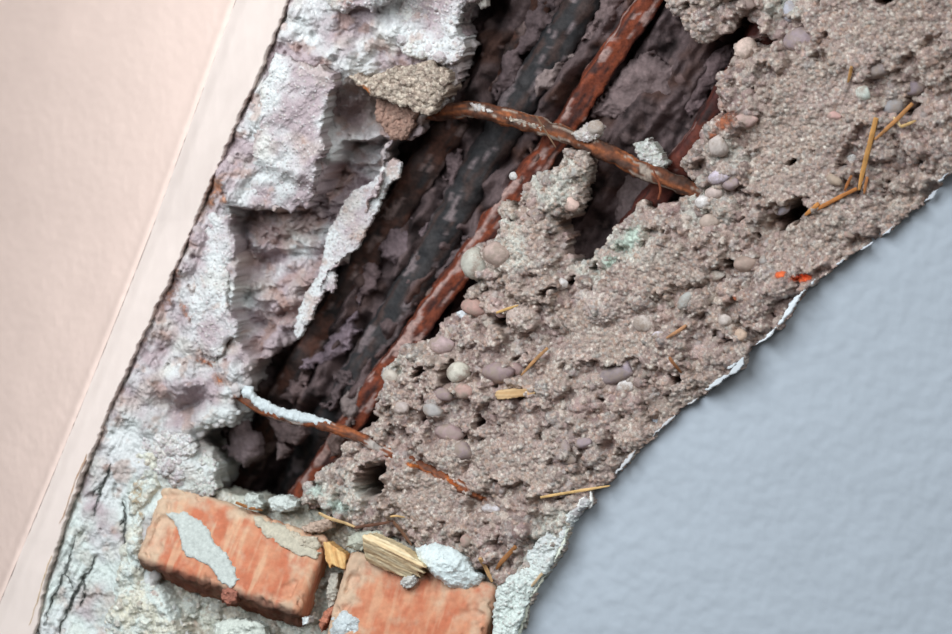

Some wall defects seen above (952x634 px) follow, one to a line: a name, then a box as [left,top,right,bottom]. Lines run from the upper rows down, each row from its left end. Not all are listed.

crack [29,454,127,633]
spalling [36,0,563,634]
spalling [251,0,952,634]